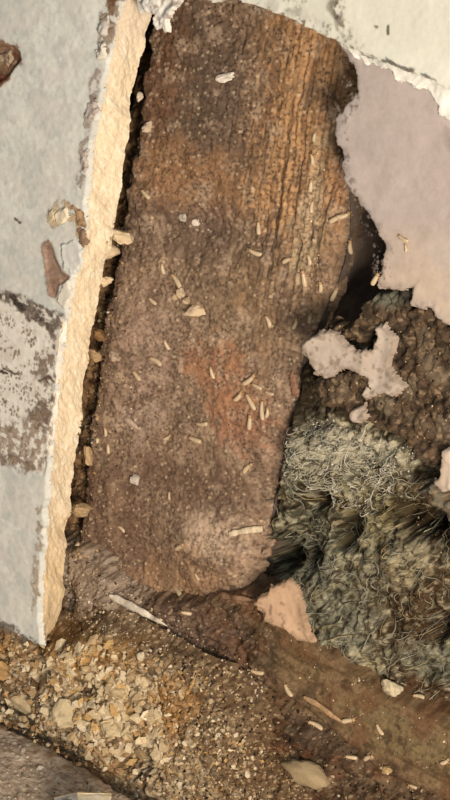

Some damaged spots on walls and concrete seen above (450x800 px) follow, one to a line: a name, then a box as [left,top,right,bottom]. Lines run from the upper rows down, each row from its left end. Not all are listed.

flaking render [0,40,20,87]
flaking render [77,0,125,188]
flaking render [215,72,235,83]
peeling [42,200,90,309]
mould [0,291,64,474]